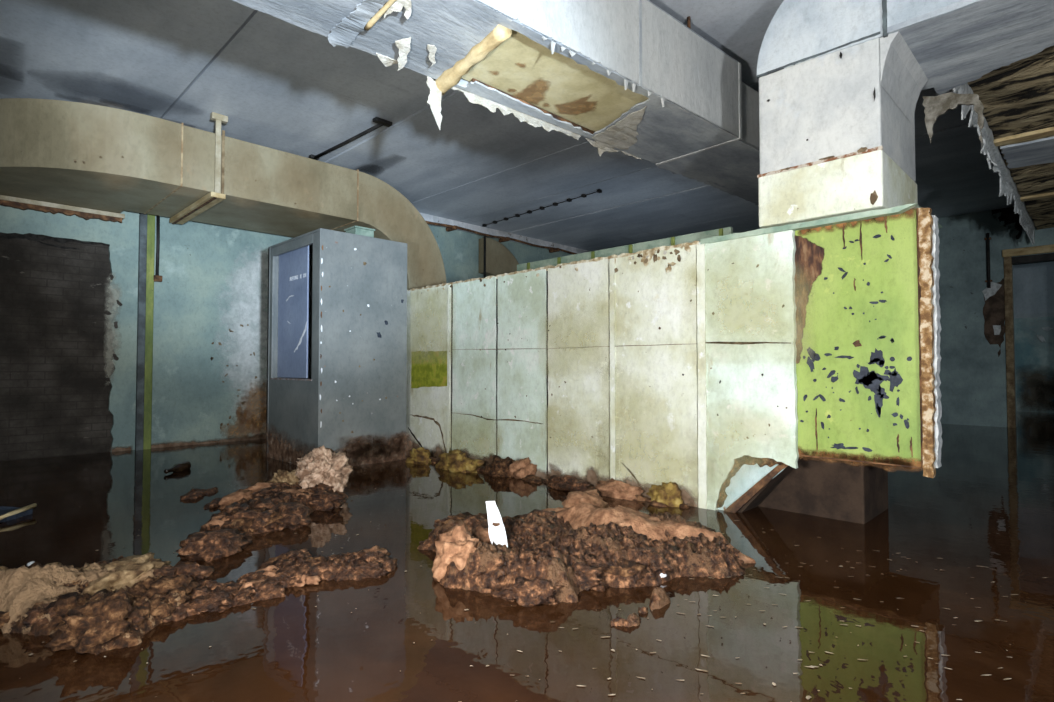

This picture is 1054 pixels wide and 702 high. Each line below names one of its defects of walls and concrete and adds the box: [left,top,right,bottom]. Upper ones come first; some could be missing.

peeling [985,207,1023,248]
spalling [103,274,123,381]
corrosion [794,207,915,364]
corrosion [227,385,267,439]
peeling [800,335,912,452]
corrosion [798,408,921,470]